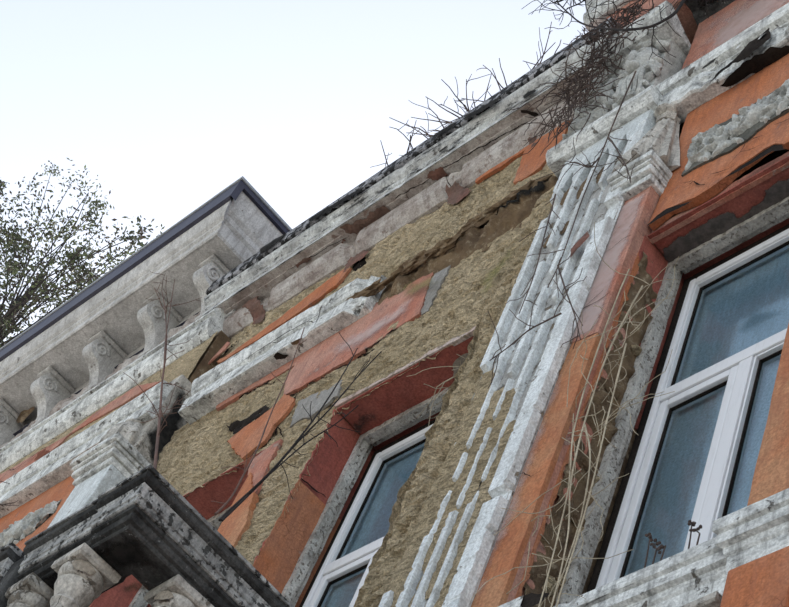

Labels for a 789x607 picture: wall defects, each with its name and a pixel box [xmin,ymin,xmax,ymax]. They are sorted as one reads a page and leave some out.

flaking render [702,28,789,87]
flaking render [154,156,613,607]
flaking render [582,252,659,450]